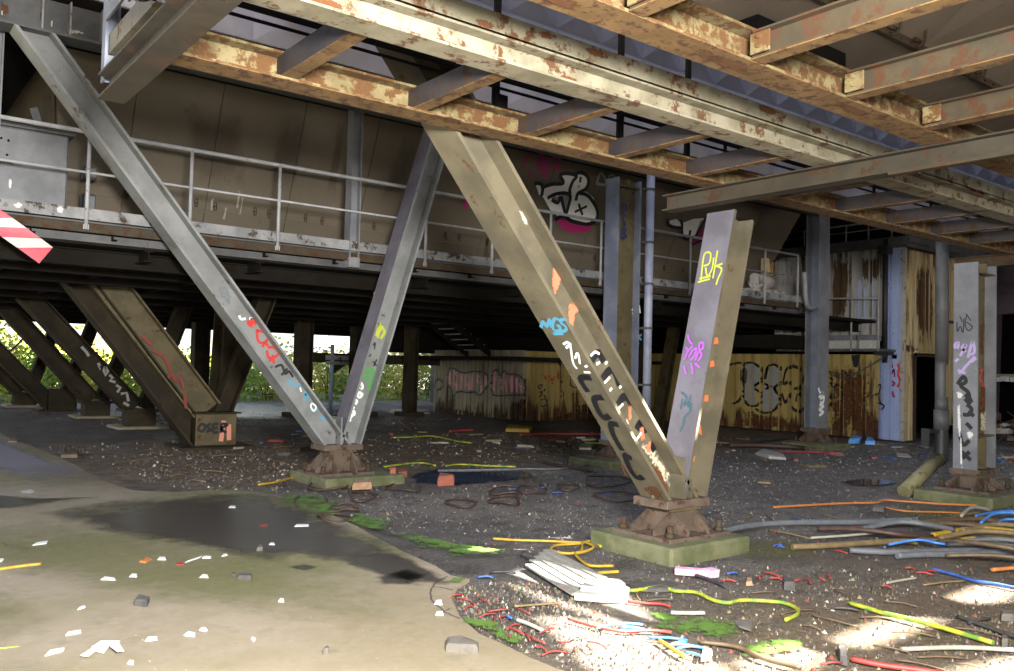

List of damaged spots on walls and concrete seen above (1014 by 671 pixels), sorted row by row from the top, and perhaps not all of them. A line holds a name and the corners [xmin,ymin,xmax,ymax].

corrosion [311,0,343,9]
corrosion [586,48,608,58]
corrosion [903,264,933,352]
corrosion [828,369,878,434]